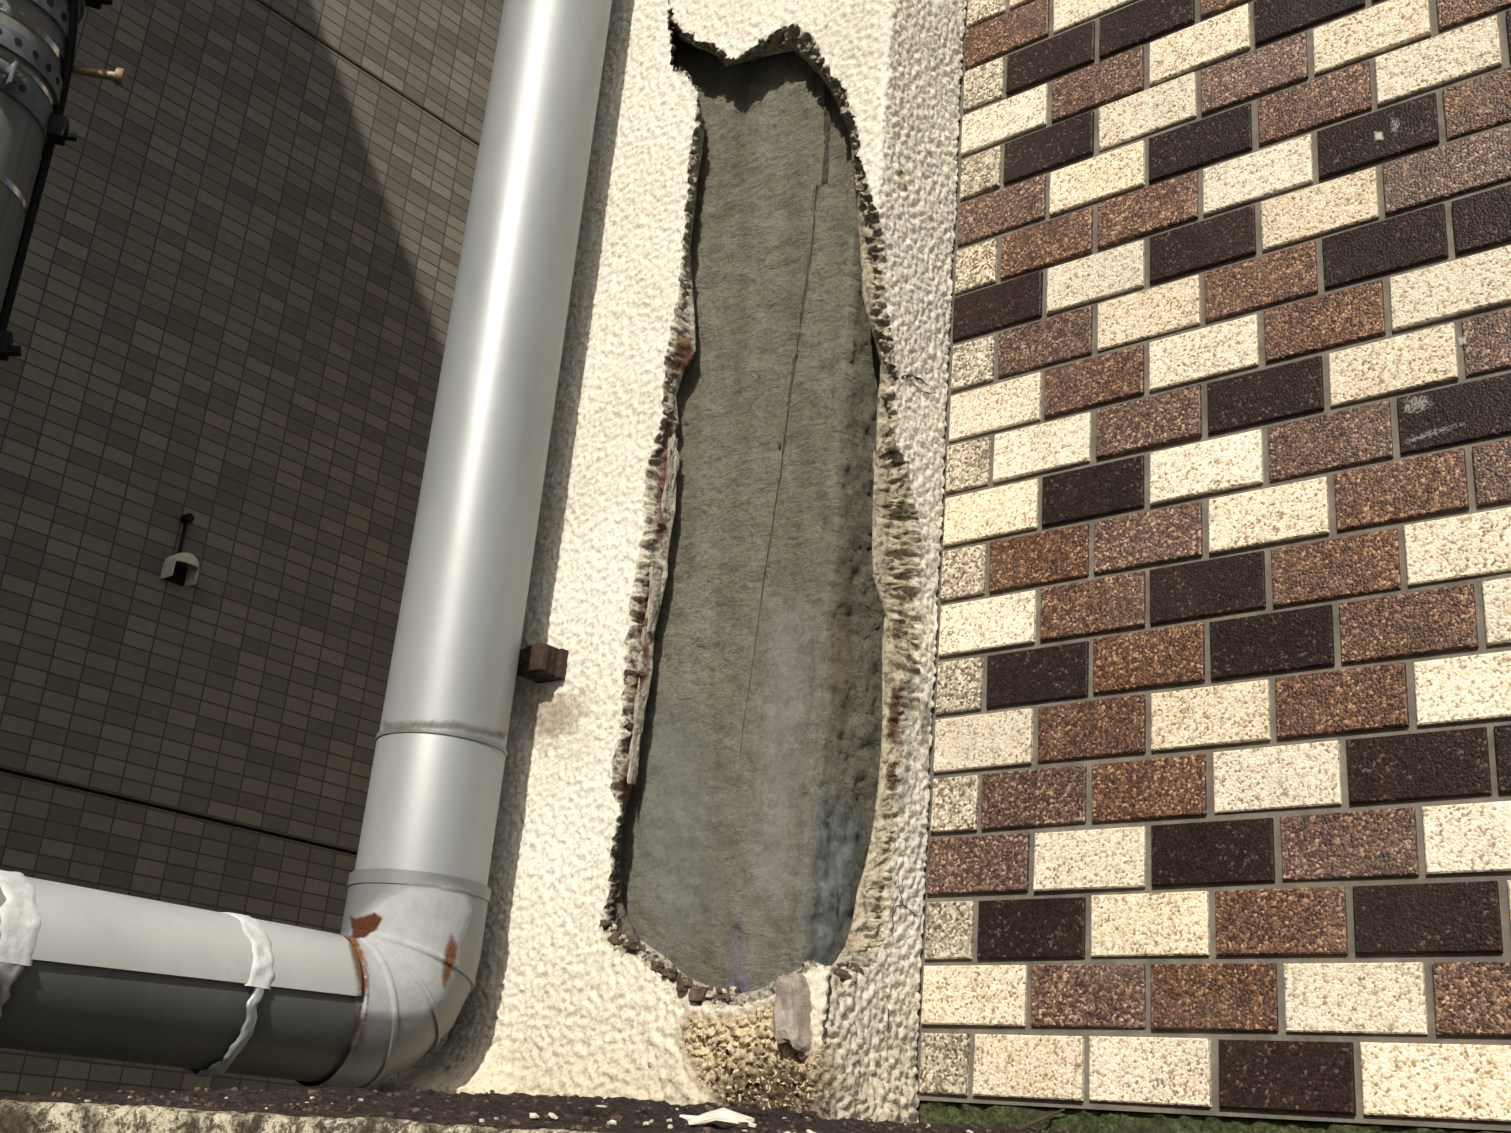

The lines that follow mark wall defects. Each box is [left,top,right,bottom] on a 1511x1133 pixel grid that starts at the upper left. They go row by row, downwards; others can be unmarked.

rust [675,336,695,375]
crack [739,88,832,768]
rust [656,454,668,540]
flaking render [599,3,930,1133]
crack [820,975,832,1109]